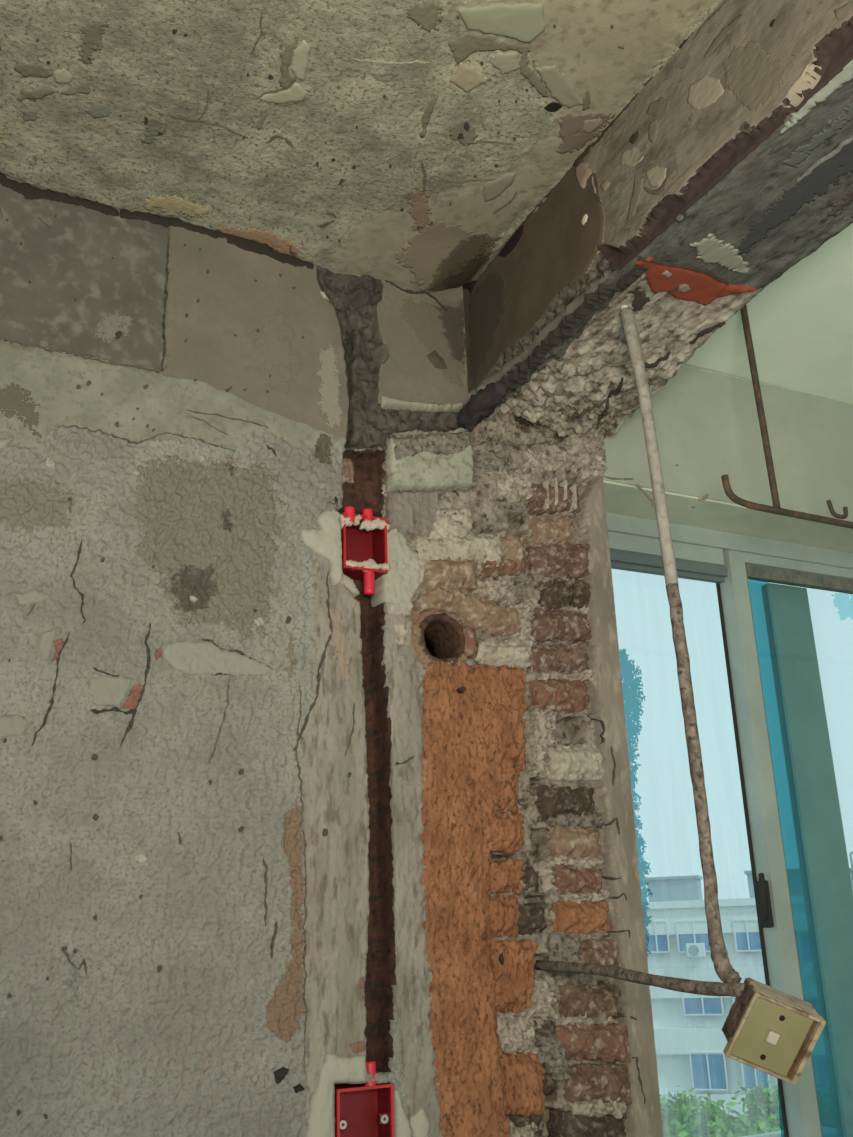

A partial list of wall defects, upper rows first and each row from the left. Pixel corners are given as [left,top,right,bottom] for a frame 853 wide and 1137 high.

crack [158,90,293,146]
crack [256,80,309,107]
peeling [259,40,311,104]
peeling [480,52,520,75]
flaking render [575,162,610,191]
spalling [597,0,853,312]
crack [0,173,314,373]
spalling [0,383,42,438]
crack [31,541,86,747]
crack [90,622,151,747]
crack [199,639,272,762]
crack [263,571,333,1073]